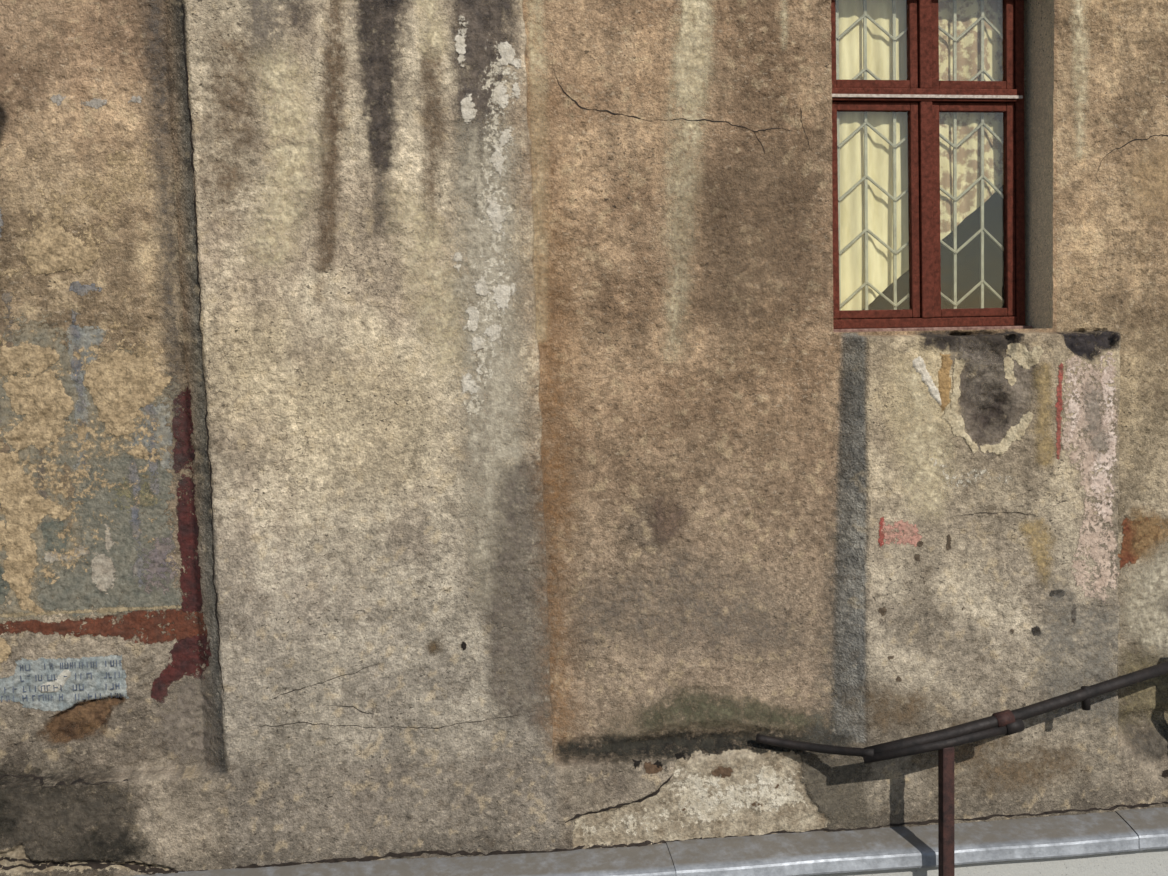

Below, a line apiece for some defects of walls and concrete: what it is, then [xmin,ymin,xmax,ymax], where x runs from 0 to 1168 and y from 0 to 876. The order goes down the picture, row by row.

water stain [213,0,345,267]
water stain [356,0,513,369]
water stain [529,0,548,343]
crack [552,63,810,154]
water stain [0,770,143,871]
spalling [43,696,125,742]
water stain [487,461,554,725]
spalling [565,749,830,849]
spalling [878,343,1044,561]
peeling [1055,351,1168,655]